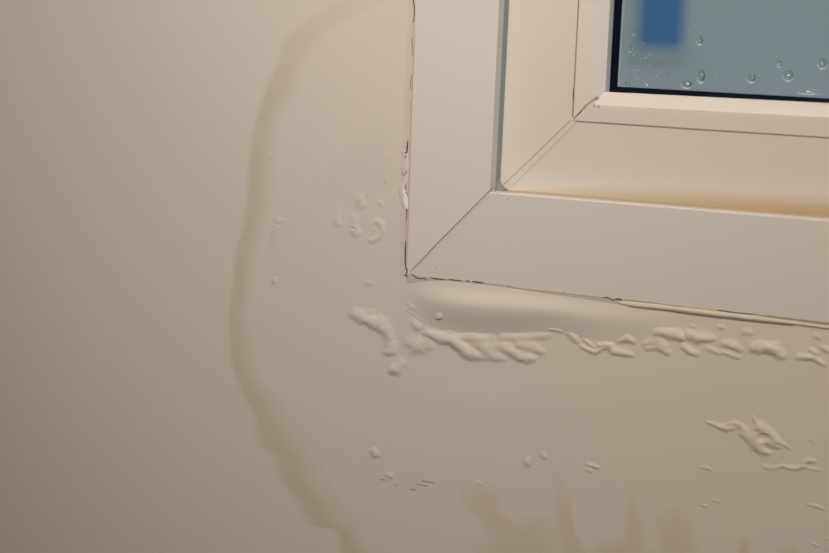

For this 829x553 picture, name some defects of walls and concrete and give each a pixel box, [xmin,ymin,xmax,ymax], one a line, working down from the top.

water stain [227,0,379,553]
water stain [457,471,699,553]